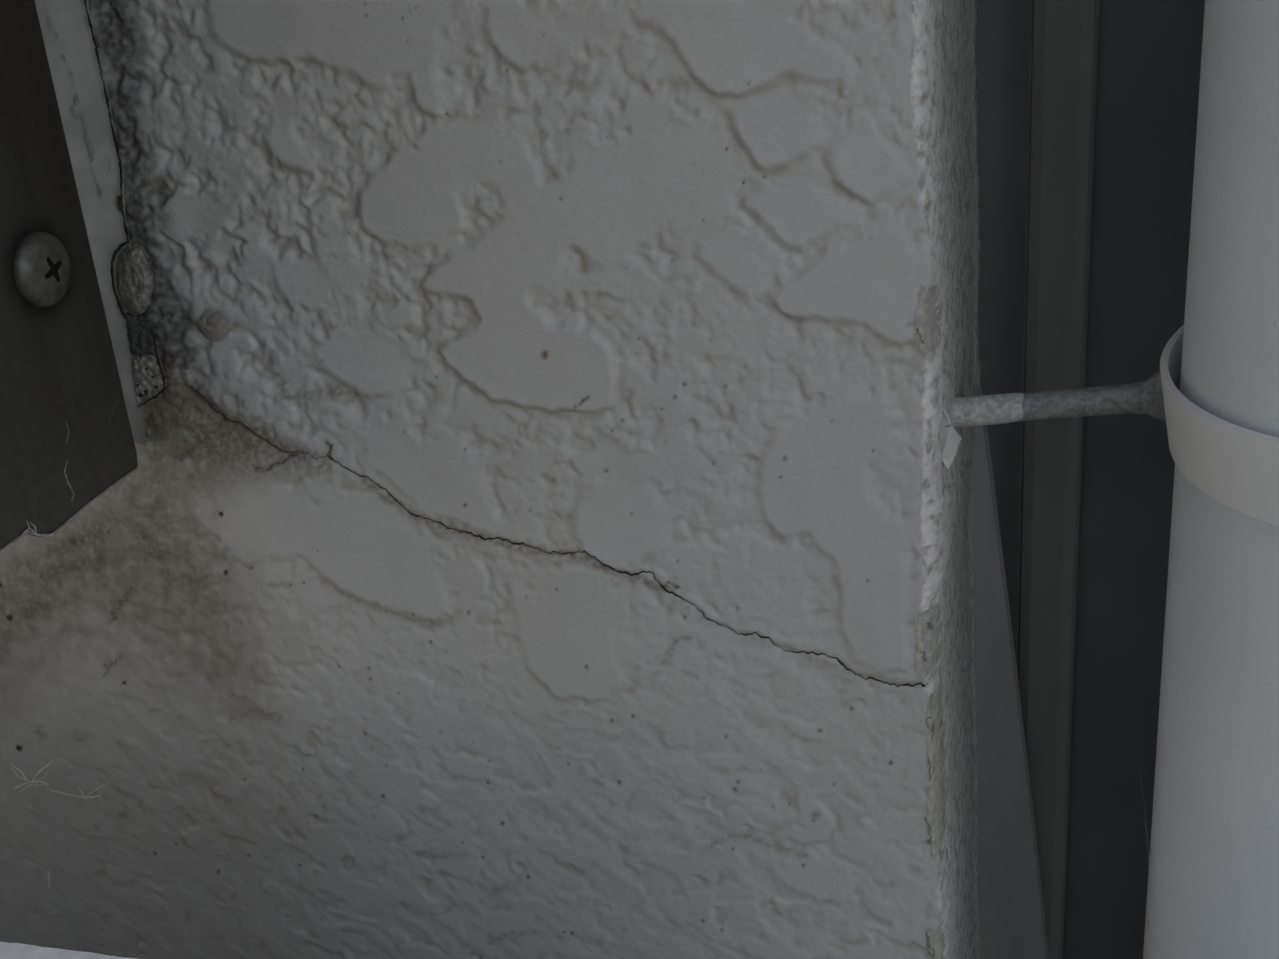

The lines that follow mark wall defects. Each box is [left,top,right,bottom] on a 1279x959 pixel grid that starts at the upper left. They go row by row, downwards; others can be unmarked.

crack [190,387,928,687]